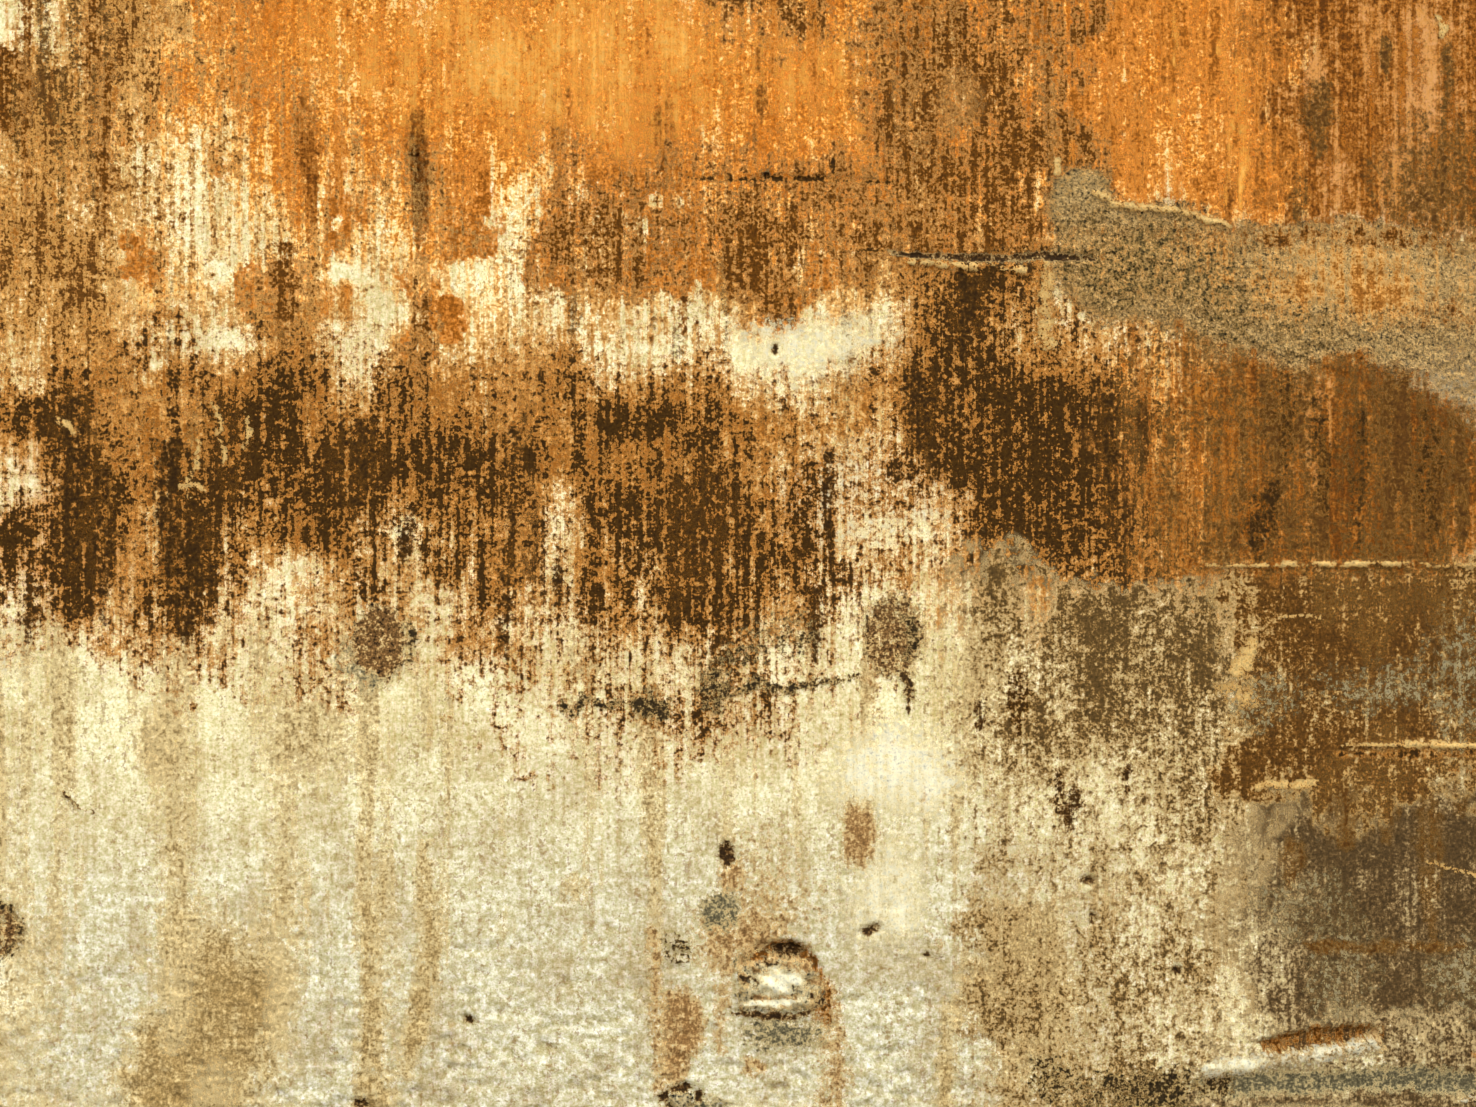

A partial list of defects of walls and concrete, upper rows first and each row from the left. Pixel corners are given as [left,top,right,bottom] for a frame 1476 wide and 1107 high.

rust [0,0,1476,675]
spalling [1034,156,1476,441]
crack [1201,1020,1387,1079]